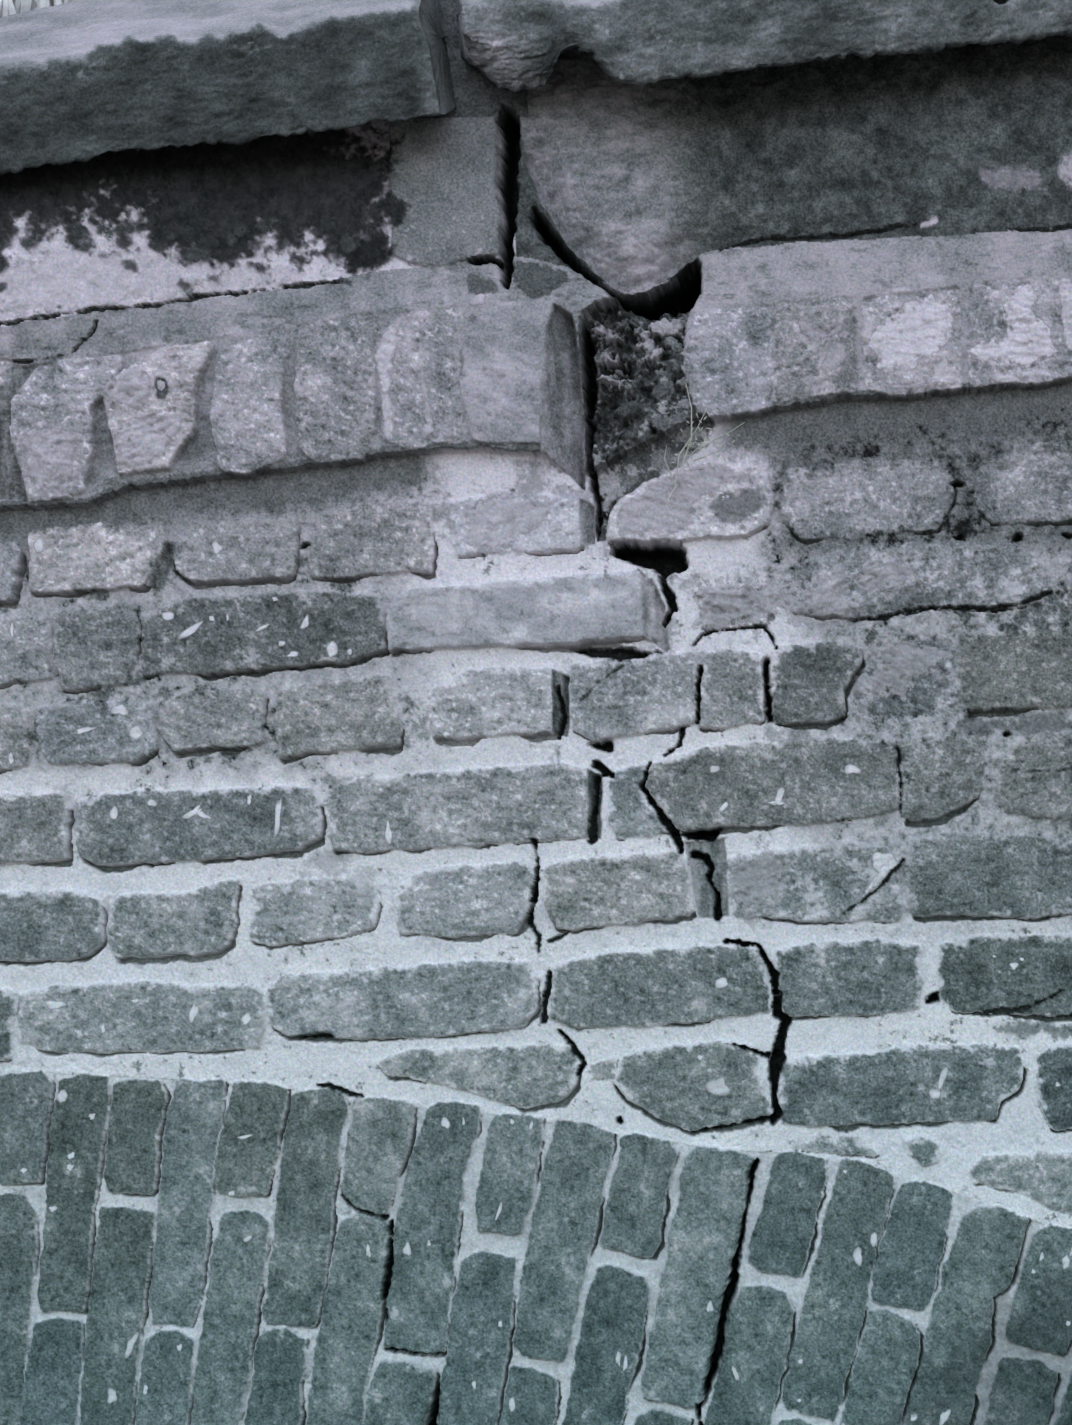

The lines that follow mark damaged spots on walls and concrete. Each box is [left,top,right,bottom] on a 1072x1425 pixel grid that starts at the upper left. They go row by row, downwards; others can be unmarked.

crack [555,624,793,1133]
crack [842,858,906,916]
crack [694,1158,759,1425]